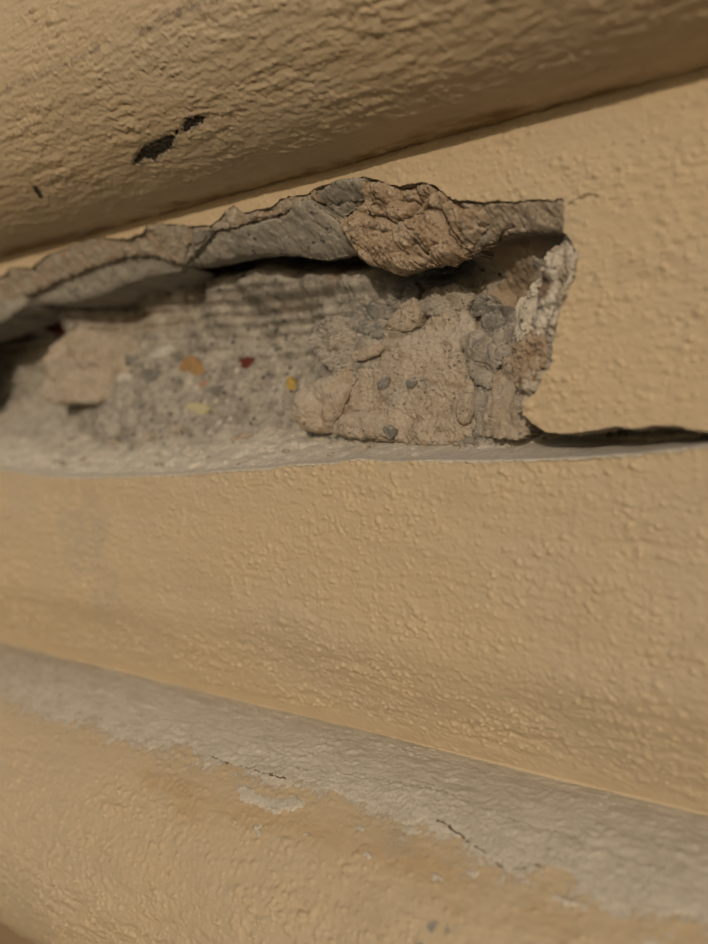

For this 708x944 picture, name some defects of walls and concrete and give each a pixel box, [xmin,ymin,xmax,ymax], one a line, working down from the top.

spalling [0,177,708,479]
peeling [237,783,307,837]
crack [436,819,546,871]